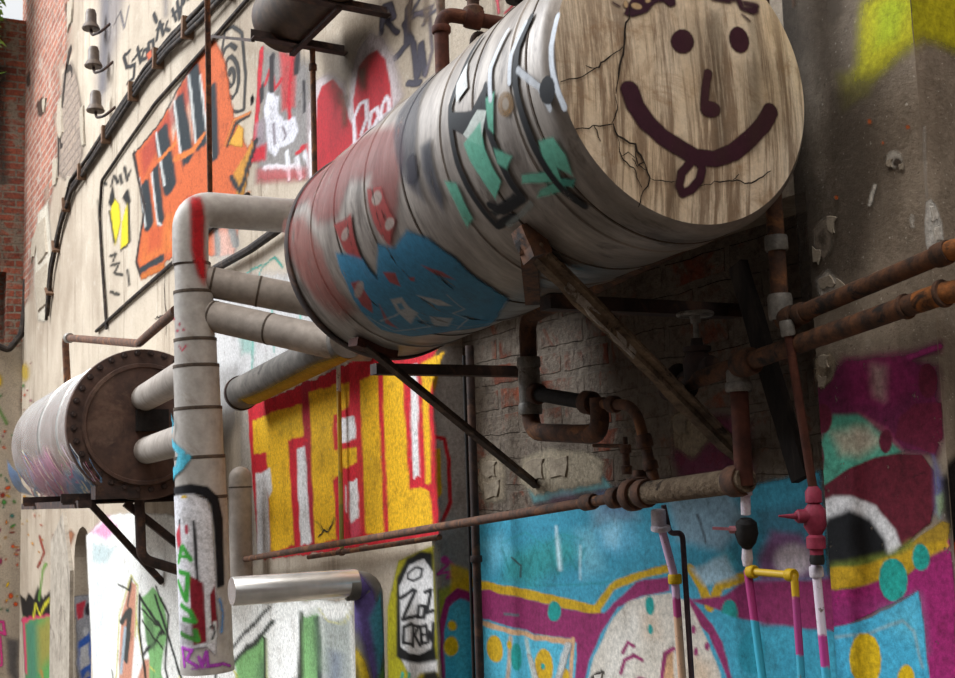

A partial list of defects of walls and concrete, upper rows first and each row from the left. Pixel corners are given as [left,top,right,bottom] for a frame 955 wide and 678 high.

peeling [564,282,637,359]
peeling [478,454,505,503]
peeling [520,449,604,495]